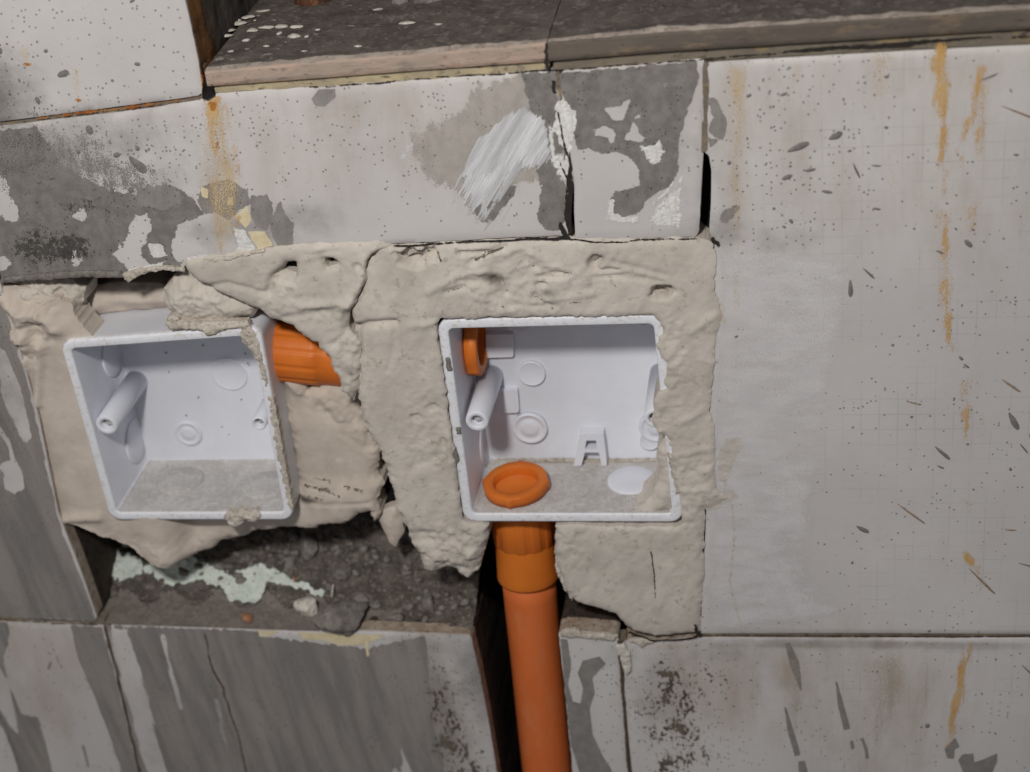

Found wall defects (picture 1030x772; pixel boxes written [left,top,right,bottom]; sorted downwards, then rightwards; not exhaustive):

damp [0,86,197,214]
spalling [1,197,273,283]
rust [37,0,242,253]
crack [309,35,1030,247]
rust [928,42,990,352]
peeling [112,542,324,623]
crack [204,634,247,772]
damp [634,640,959,772]
rust [945,642,975,759]